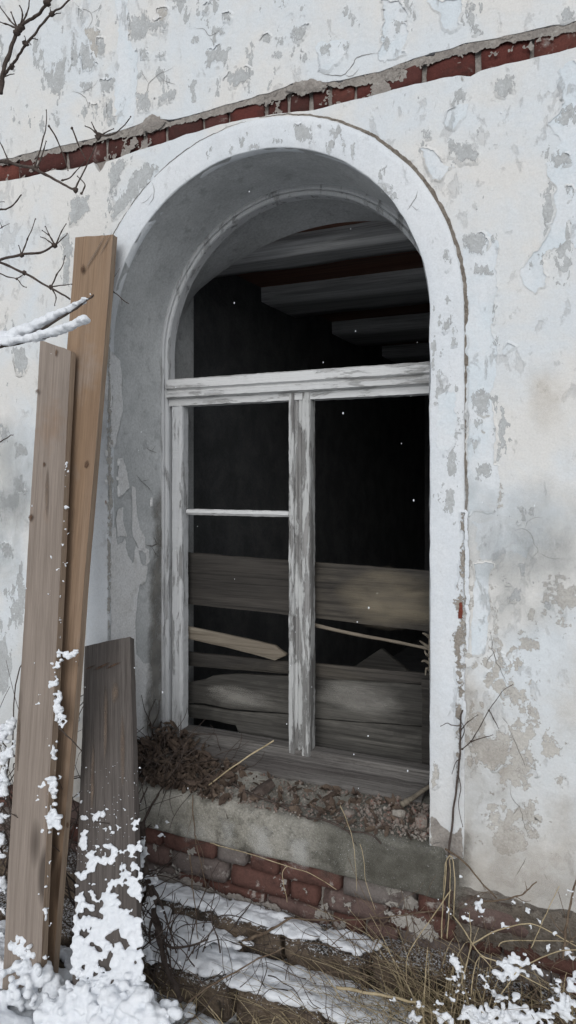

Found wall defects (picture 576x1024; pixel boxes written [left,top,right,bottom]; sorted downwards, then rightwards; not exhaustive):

peeling [11,0,312,235]
peeling [272,122,355,160]
peeling [320,34,349,56]
peeling [377,0,416,63]
peeling [418,88,481,183]
peeling [493,74,515,101]
peeling [488,6,576,57]
peeling [520,59,576,295]
peeling [105,338,155,740]
peeling [228,230,576,859]